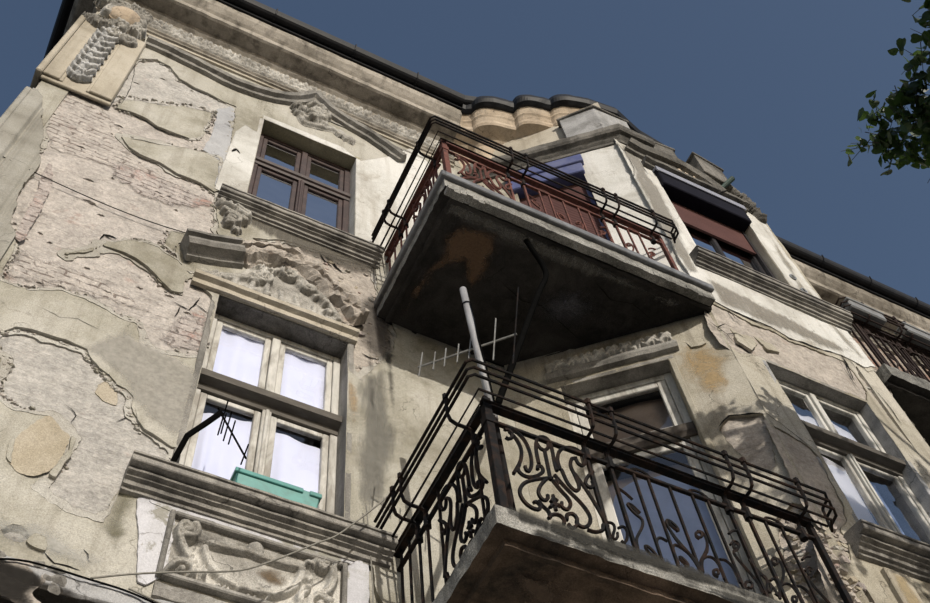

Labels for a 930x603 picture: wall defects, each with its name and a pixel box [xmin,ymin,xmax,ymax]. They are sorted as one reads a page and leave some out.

spalling [0,59,236,362]
rust [432,228,493,285]
leakage [364,297,392,361]
crack [709,301,857,385]
spalling [0,319,178,523]
leakage [362,374,392,501]
crack [719,408,814,449]
spalling [721,416,872,603]
spalling [0,518,67,603]